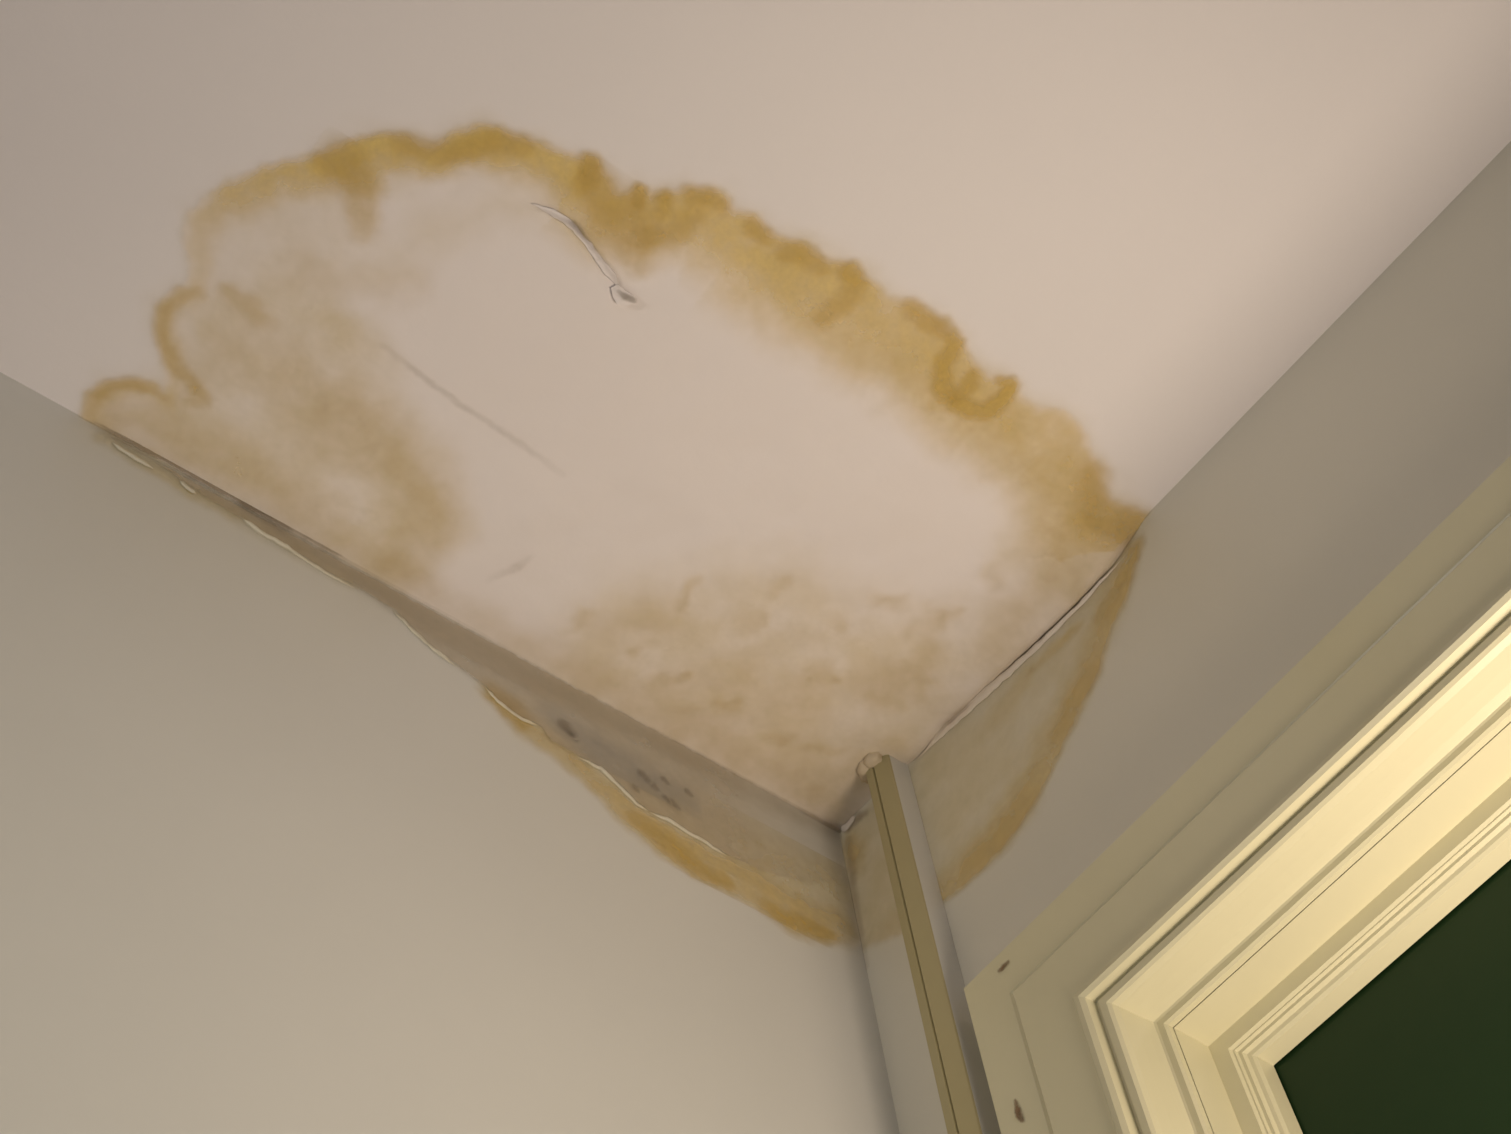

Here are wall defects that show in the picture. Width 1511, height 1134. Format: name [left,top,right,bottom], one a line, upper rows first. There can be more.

damp [225,128,1016,415]
crack [841,816,856,832]